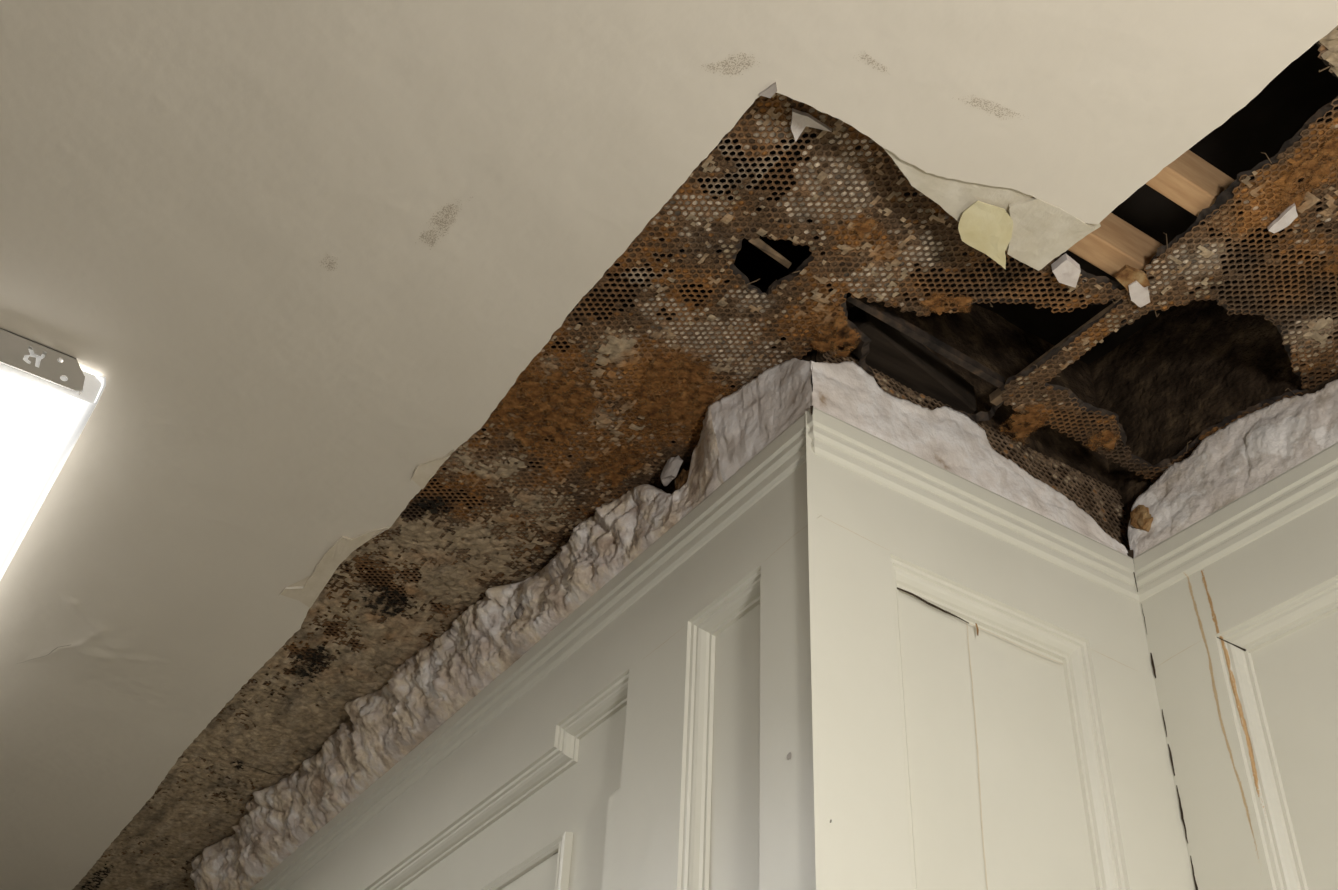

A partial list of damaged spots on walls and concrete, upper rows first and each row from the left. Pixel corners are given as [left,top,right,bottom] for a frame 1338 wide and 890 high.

spalling [759,82,777,98]
spalling [791,108,832,141]
spalling [1267,203,1298,233]
rust [920,293,974,313]
spalling [1051,254,1081,288]
spalling [1115,265,1150,308]
rust [811,315,860,358]
rust [1000,402,1047,445]
rust [1086,430,1117,450]
water stain [360,585,411,618]
spalling [190,358,1338,890]
water stain [291,645,331,683]